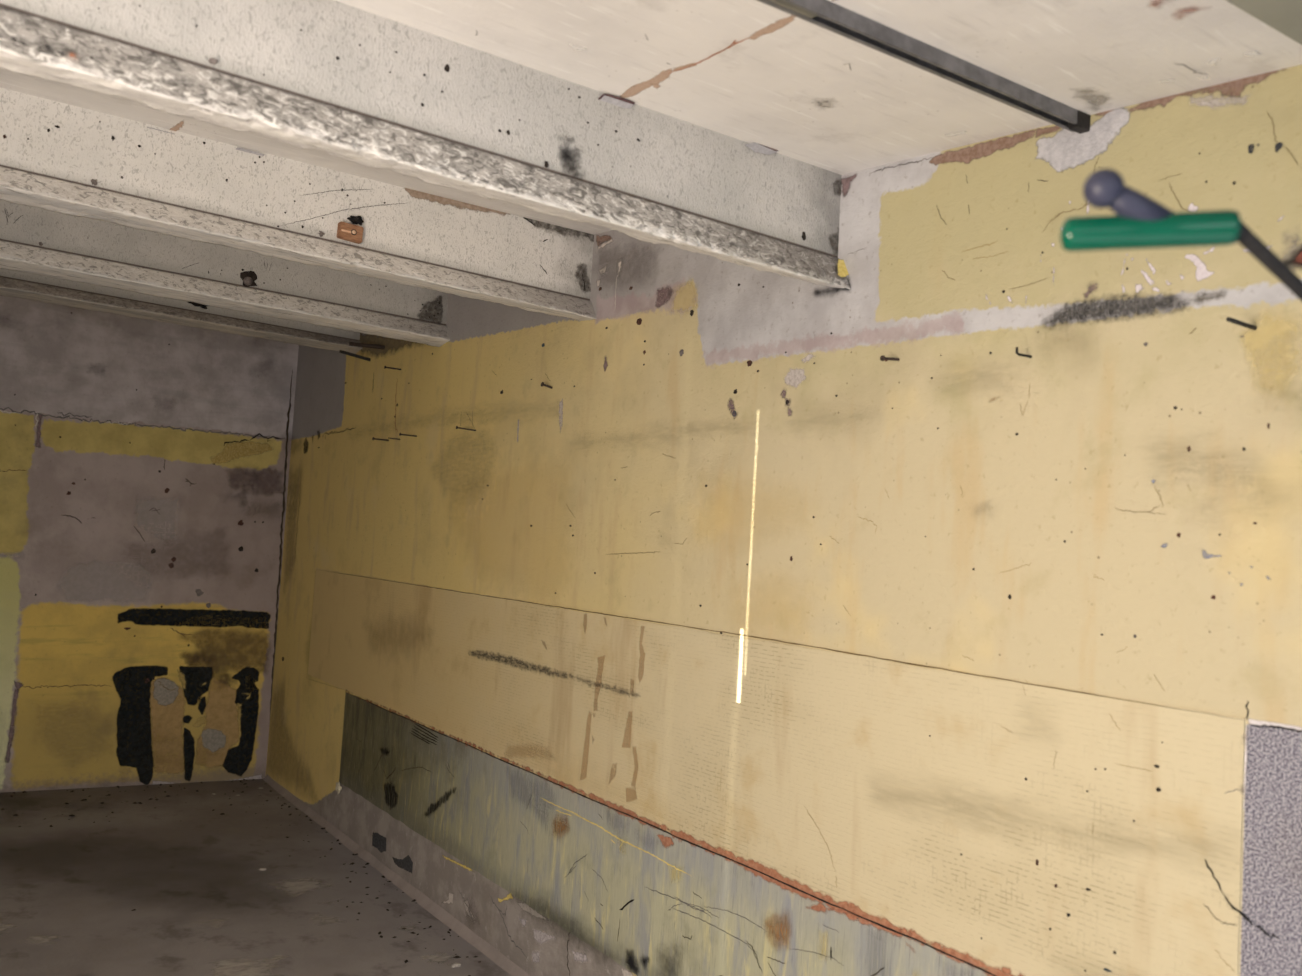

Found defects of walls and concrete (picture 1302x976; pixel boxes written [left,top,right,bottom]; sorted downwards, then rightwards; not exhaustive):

spalling [841,174,856,196]
peeling [1121,247,1215,293]
water stain [192,630,267,683]
rust [346,690,1022,976]